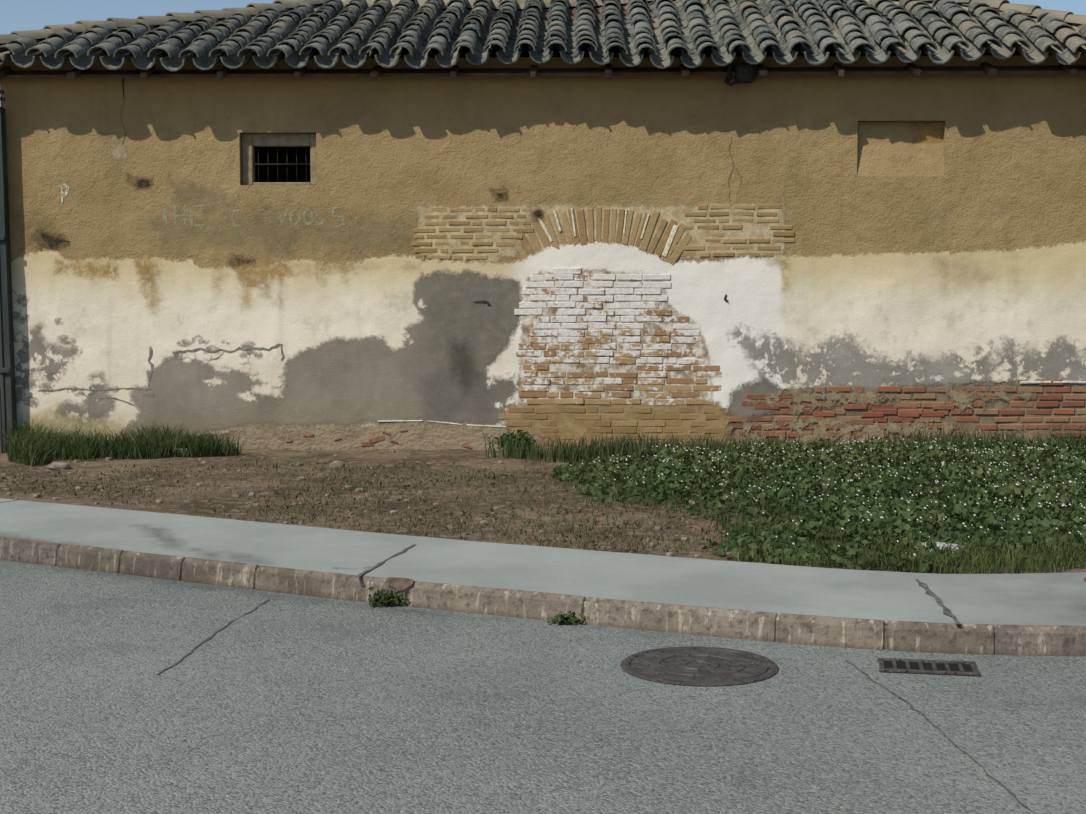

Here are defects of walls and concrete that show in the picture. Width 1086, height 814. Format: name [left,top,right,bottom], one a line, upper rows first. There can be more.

peeling [11,229,1086,451]